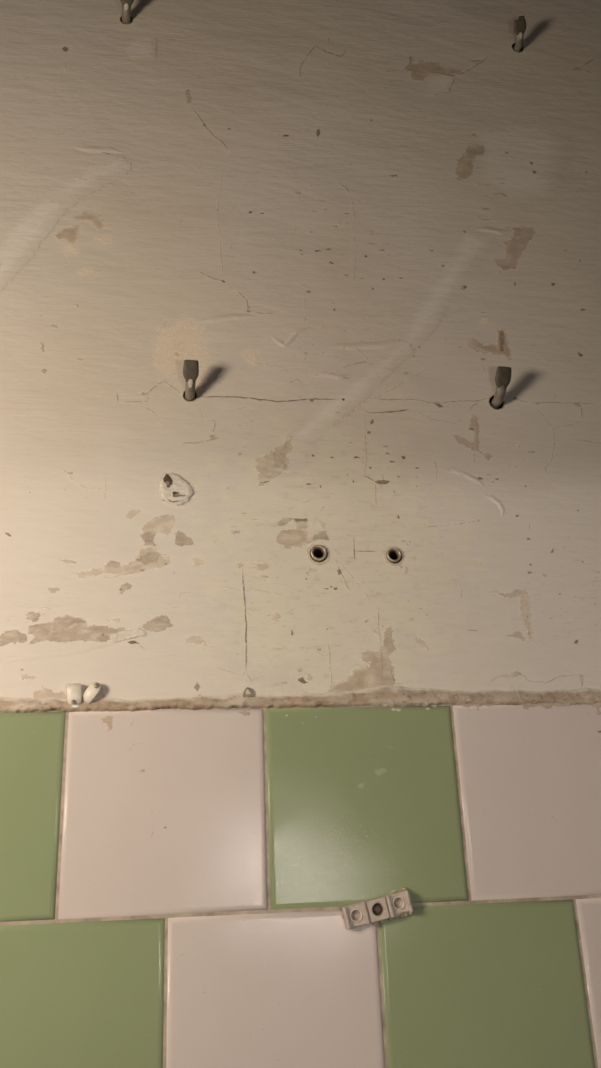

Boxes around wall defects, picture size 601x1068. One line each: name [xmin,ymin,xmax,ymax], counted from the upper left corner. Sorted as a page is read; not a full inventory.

peeling [405,58,486,95]
peeling [495,225,534,270]
crack [116,361,586,444]
peeling [255,438,292,485]
peeling [77,473,194,594]
peeling [276,518,347,590]
peeling [0,611,172,648]
crack [240,569,248,653]